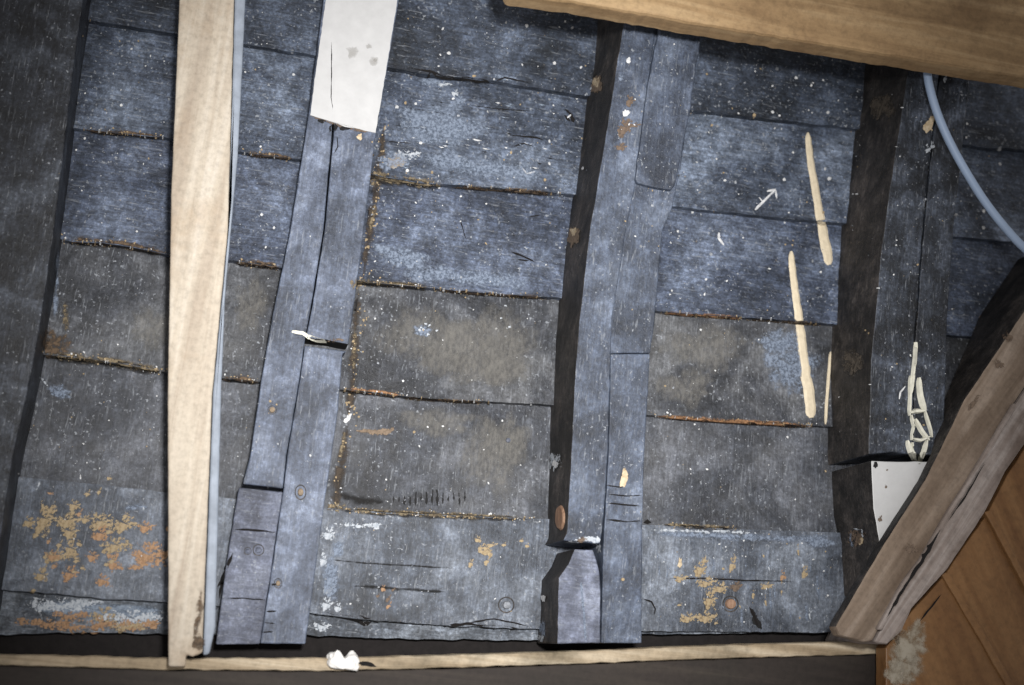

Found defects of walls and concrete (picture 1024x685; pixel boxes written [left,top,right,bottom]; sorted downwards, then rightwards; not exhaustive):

rust [88,127,164,141]
rust [242,148,291,162]
rust [454,183,563,197]
rust [237,258,279,271]
rust [42,233,168,375]
rust [328,125,546,522]
rust [224,373,257,385]
rust [649,412,817,428]